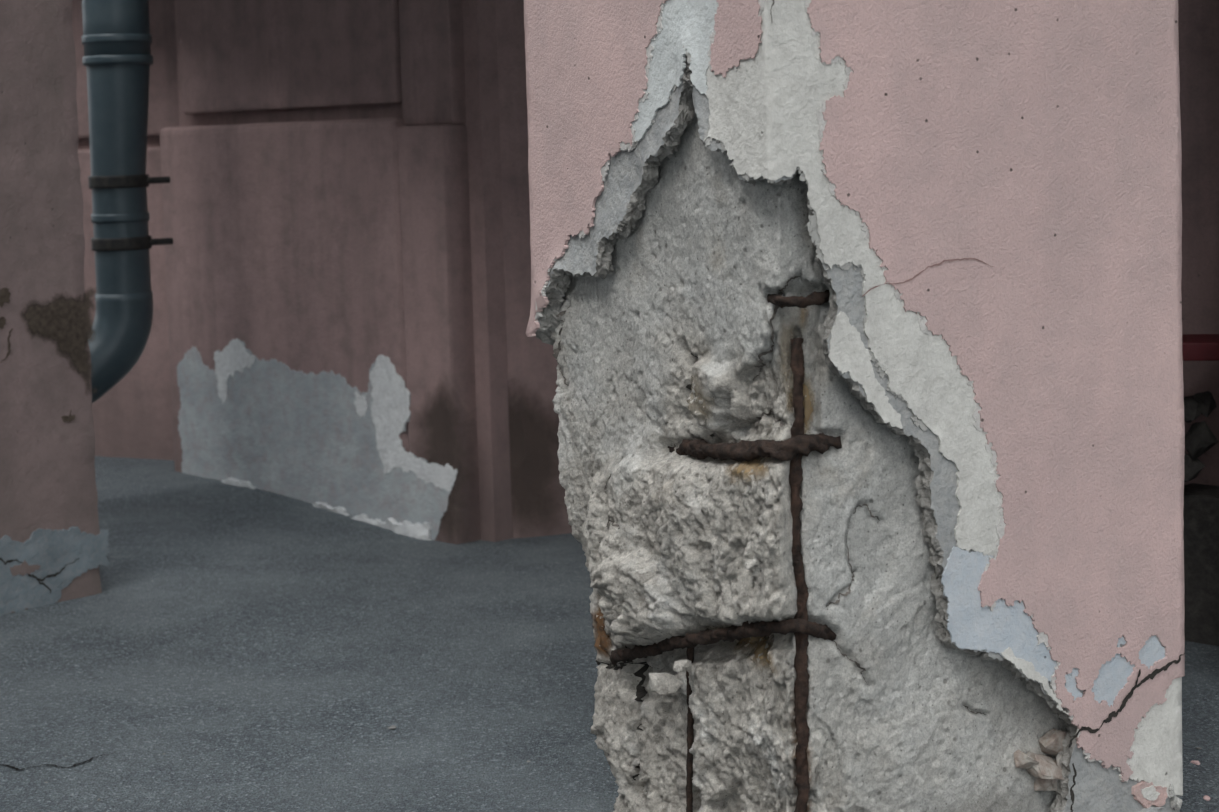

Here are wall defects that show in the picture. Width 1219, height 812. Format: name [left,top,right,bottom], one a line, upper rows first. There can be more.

peeling [177,338,458,540]
rust [781,325,814,430]
spalling [550,0,1165,812]
crack [0,558,79,594]
peeling [0,526,111,616]
rust [738,636,772,665]
crack [1069,653,1185,812]
peeling [1119,677,1200,812]